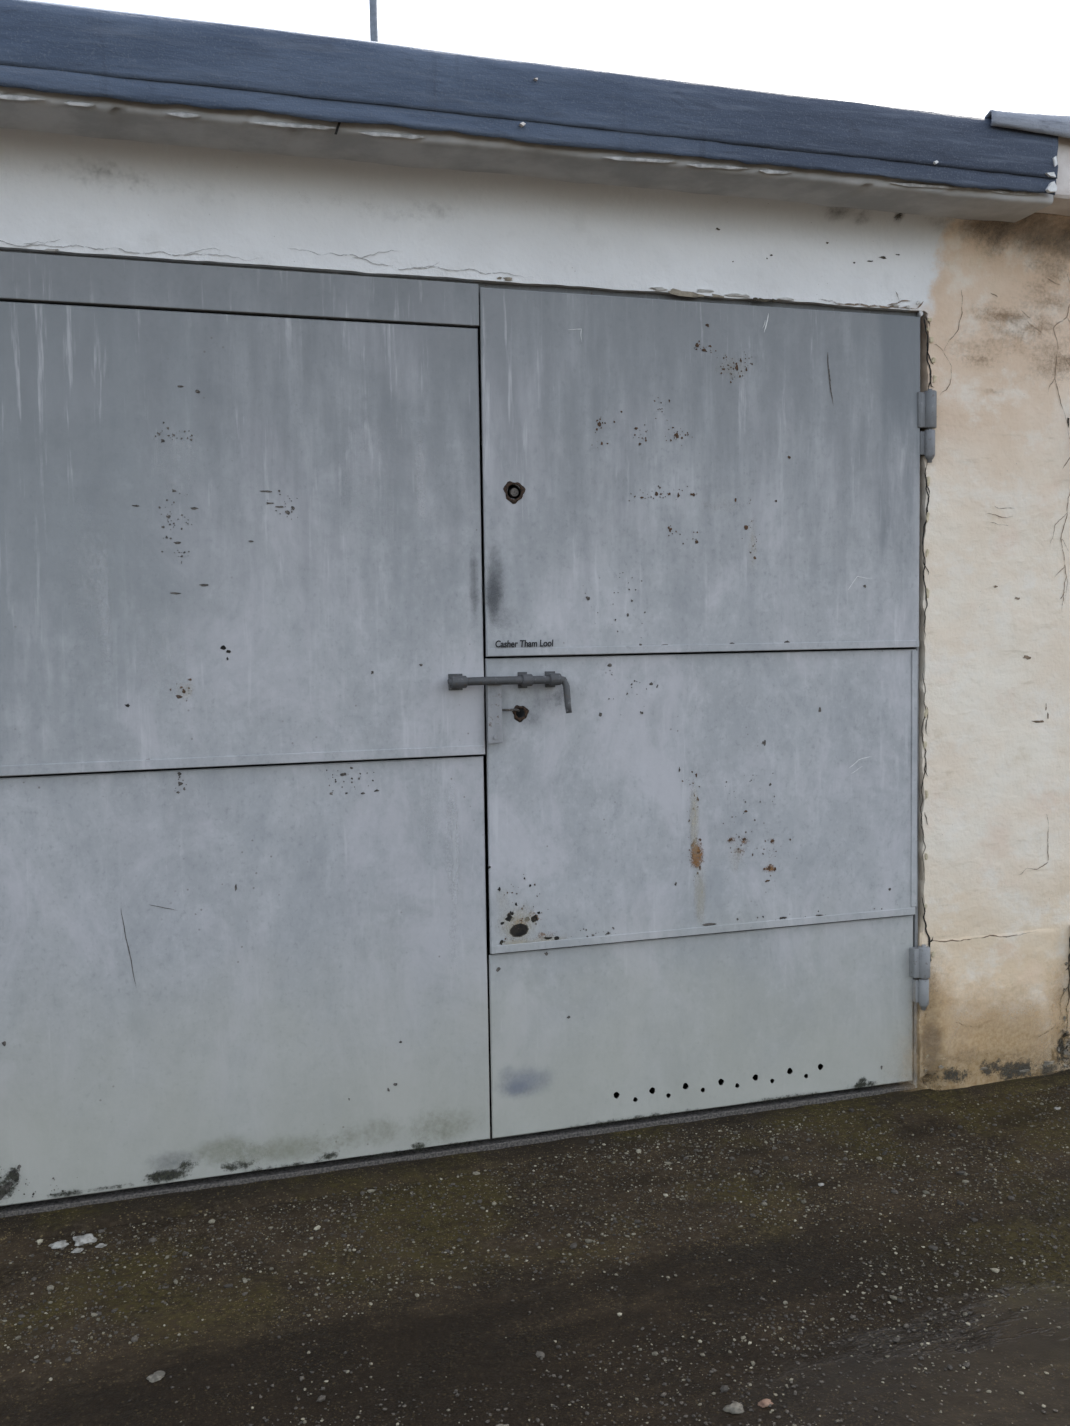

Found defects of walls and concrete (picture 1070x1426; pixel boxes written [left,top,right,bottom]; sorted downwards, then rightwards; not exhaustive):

leakage [971,214,1070,249]
crack [1049,274,1070,605]
corrosion [682,771,703,881]
leakage [919,992,1070,1090]